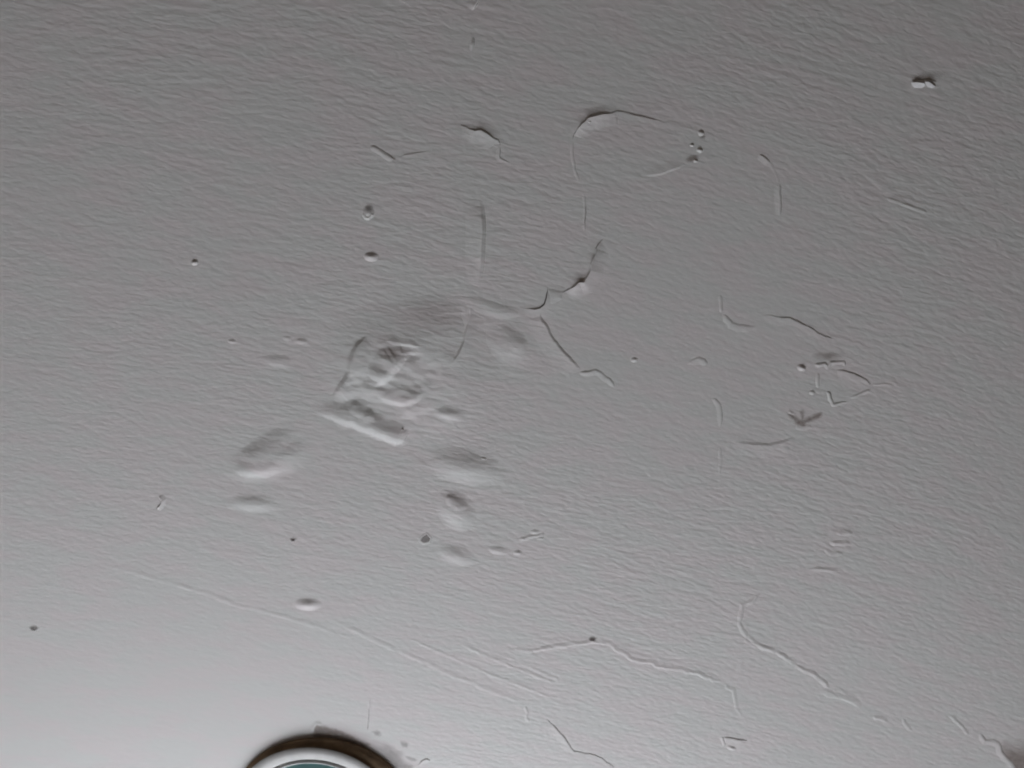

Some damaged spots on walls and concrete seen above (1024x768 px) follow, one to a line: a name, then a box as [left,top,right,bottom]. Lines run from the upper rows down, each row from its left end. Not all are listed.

peeling [910,79,937,88]
peeling [462,121,510,165]
crack [524,289,615,387]
crack [761,314,829,342]
crack [531,639,747,741]
crack [737,592,913,731]